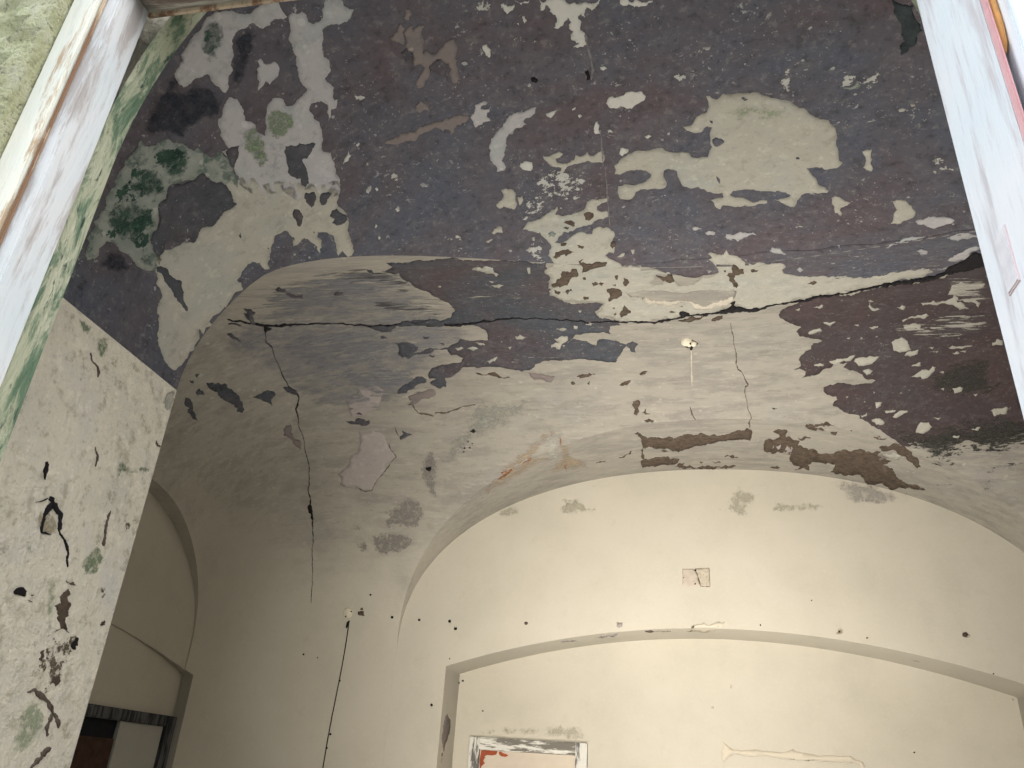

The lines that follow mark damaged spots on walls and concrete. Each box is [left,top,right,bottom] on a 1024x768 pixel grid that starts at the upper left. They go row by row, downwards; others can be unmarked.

peeling [476,0,600,48]
flaking render [383,8,557,172]
peeling [85,0,360,370]
peeling [496,69,933,350]
peeling [887,200,980,262]
peeling [814,355,878,375]
peeling [891,282,985,379]
crack [227,252,985,596]
peeling [619,436,738,470]
peeling [861,392,921,468]
peeling [916,418,940,434]
flaking render [55,581,79,650]